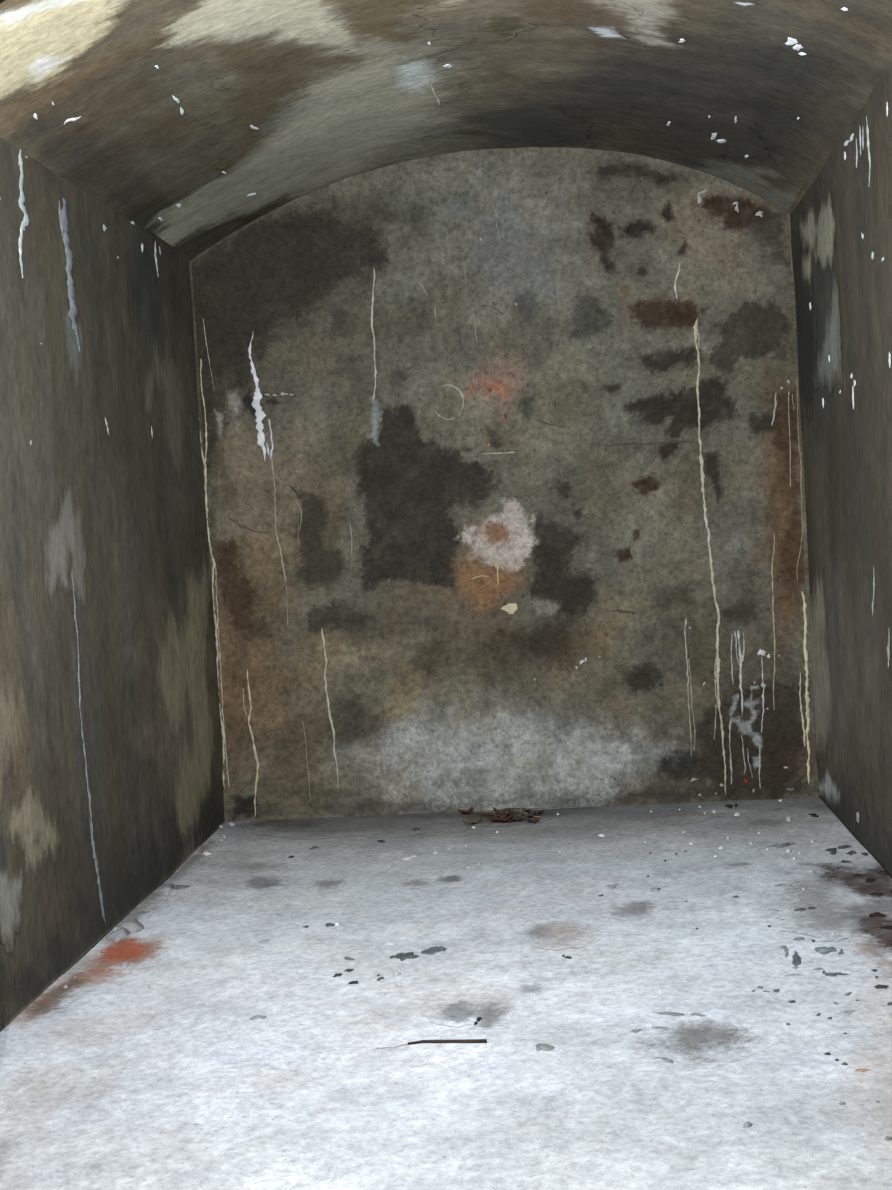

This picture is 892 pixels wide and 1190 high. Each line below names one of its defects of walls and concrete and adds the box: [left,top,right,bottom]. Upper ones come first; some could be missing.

leakage [856,116,871,182]
leakage [18,149,29,278]
leakage [0,190,892,1030]
corrosion [445,515,595,678]
corrosion [50,932,177,991]
corrosion [3,1013,53,1030]
leakage [624,1017,781,1069]